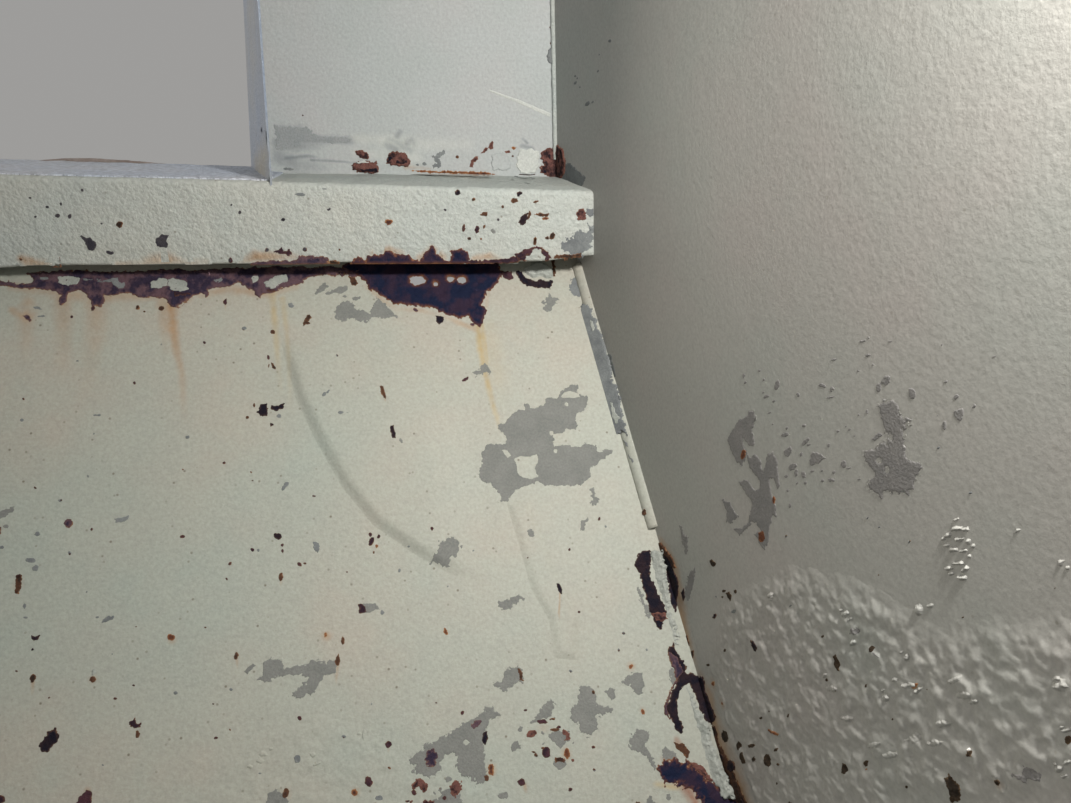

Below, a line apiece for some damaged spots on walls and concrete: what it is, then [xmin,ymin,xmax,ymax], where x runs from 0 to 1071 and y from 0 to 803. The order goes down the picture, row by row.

corrosion [351,127,432,174]
corrosion [539,145,566,178]
corrosion [80,234,212,265]
corrosion [1,280,312,439]
corrosion [228,191,527,432]
peeling [509,208,594,313]
peeling [477,275,634,531]
peeling [722,369,851,550]
peeling [244,654,341,700]
peeling [406,703,501,788]
peeling [569,670,646,738]
corrosion [651,530,779,803]